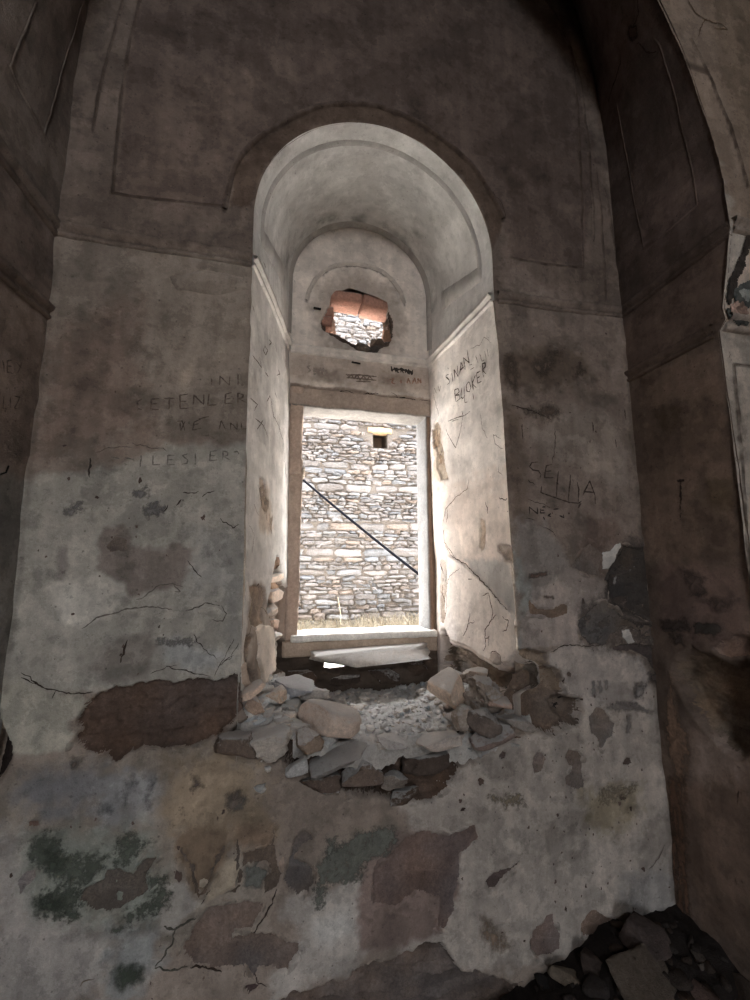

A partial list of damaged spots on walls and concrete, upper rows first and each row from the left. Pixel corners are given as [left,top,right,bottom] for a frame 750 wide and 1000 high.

spalling [321,321,356,349]
spalling [368,311,393,353]
crack [88,443,165,477]
crack [440,480,555,659]
peeling [571,534,625,582]
crack [82,561,266,676]
crack [21,673,91,698]
spalling [65,569,285,762]
spalling [333,757,466,811]
crack [254,889,277,933]
spalling [174,822,522,1000]
crack [154,891,265,986]